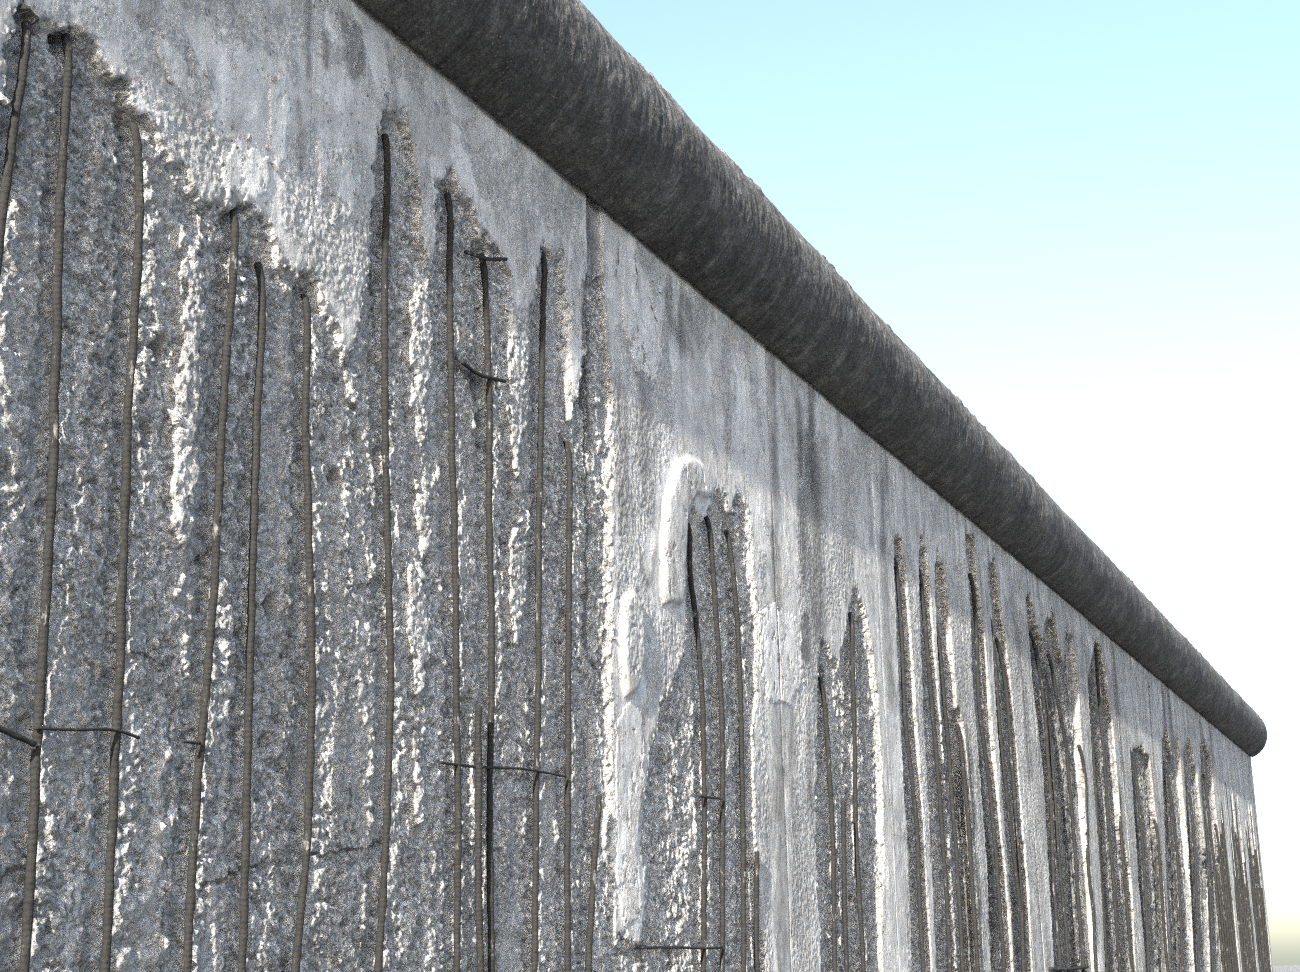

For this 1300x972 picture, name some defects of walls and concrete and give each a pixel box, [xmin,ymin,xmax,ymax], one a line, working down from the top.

spalling [0,2,884,972]
spalling [894,528,1032,972]
spalling [1026,595,1271,972]